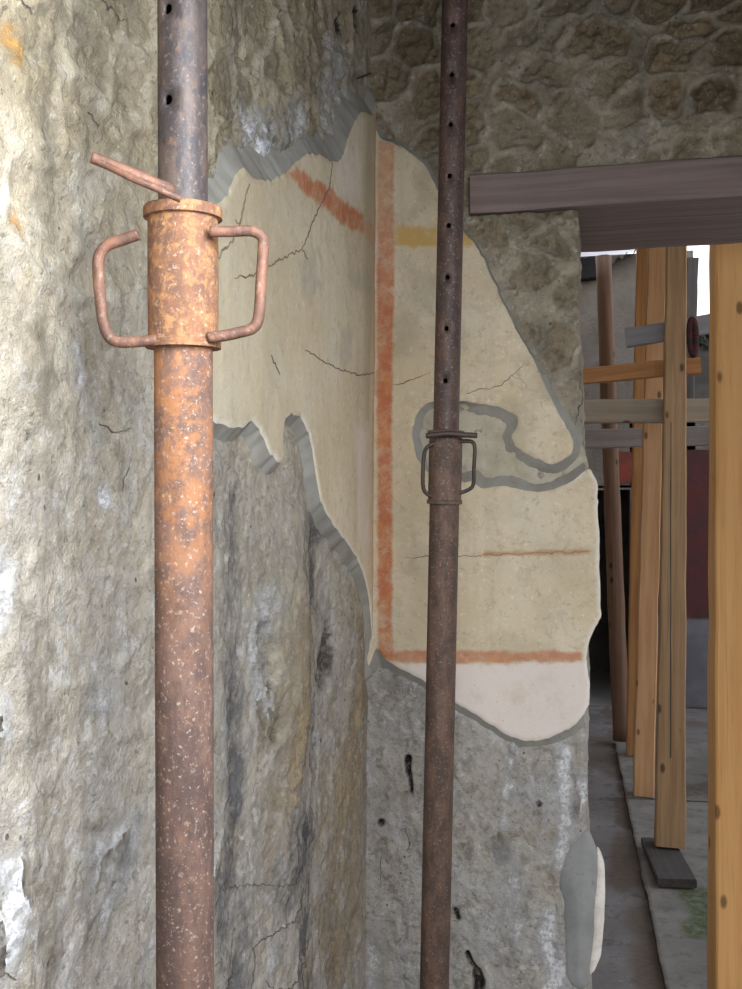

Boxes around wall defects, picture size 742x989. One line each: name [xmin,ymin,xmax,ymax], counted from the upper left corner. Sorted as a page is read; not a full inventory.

crack [218,184,250,259]
crack [235,162,333,279]
crack [305,350,430,385]
flaking render [419,409,434,466]
flaking render [459,404,589,484]
flaking render [256,622,275,689]
flaking render [315,627,333,687]
spalling [405,755,414,792]
crack [218,883,310,989]
spalling [466,950,485,989]
flaking render [560,828,605,989]